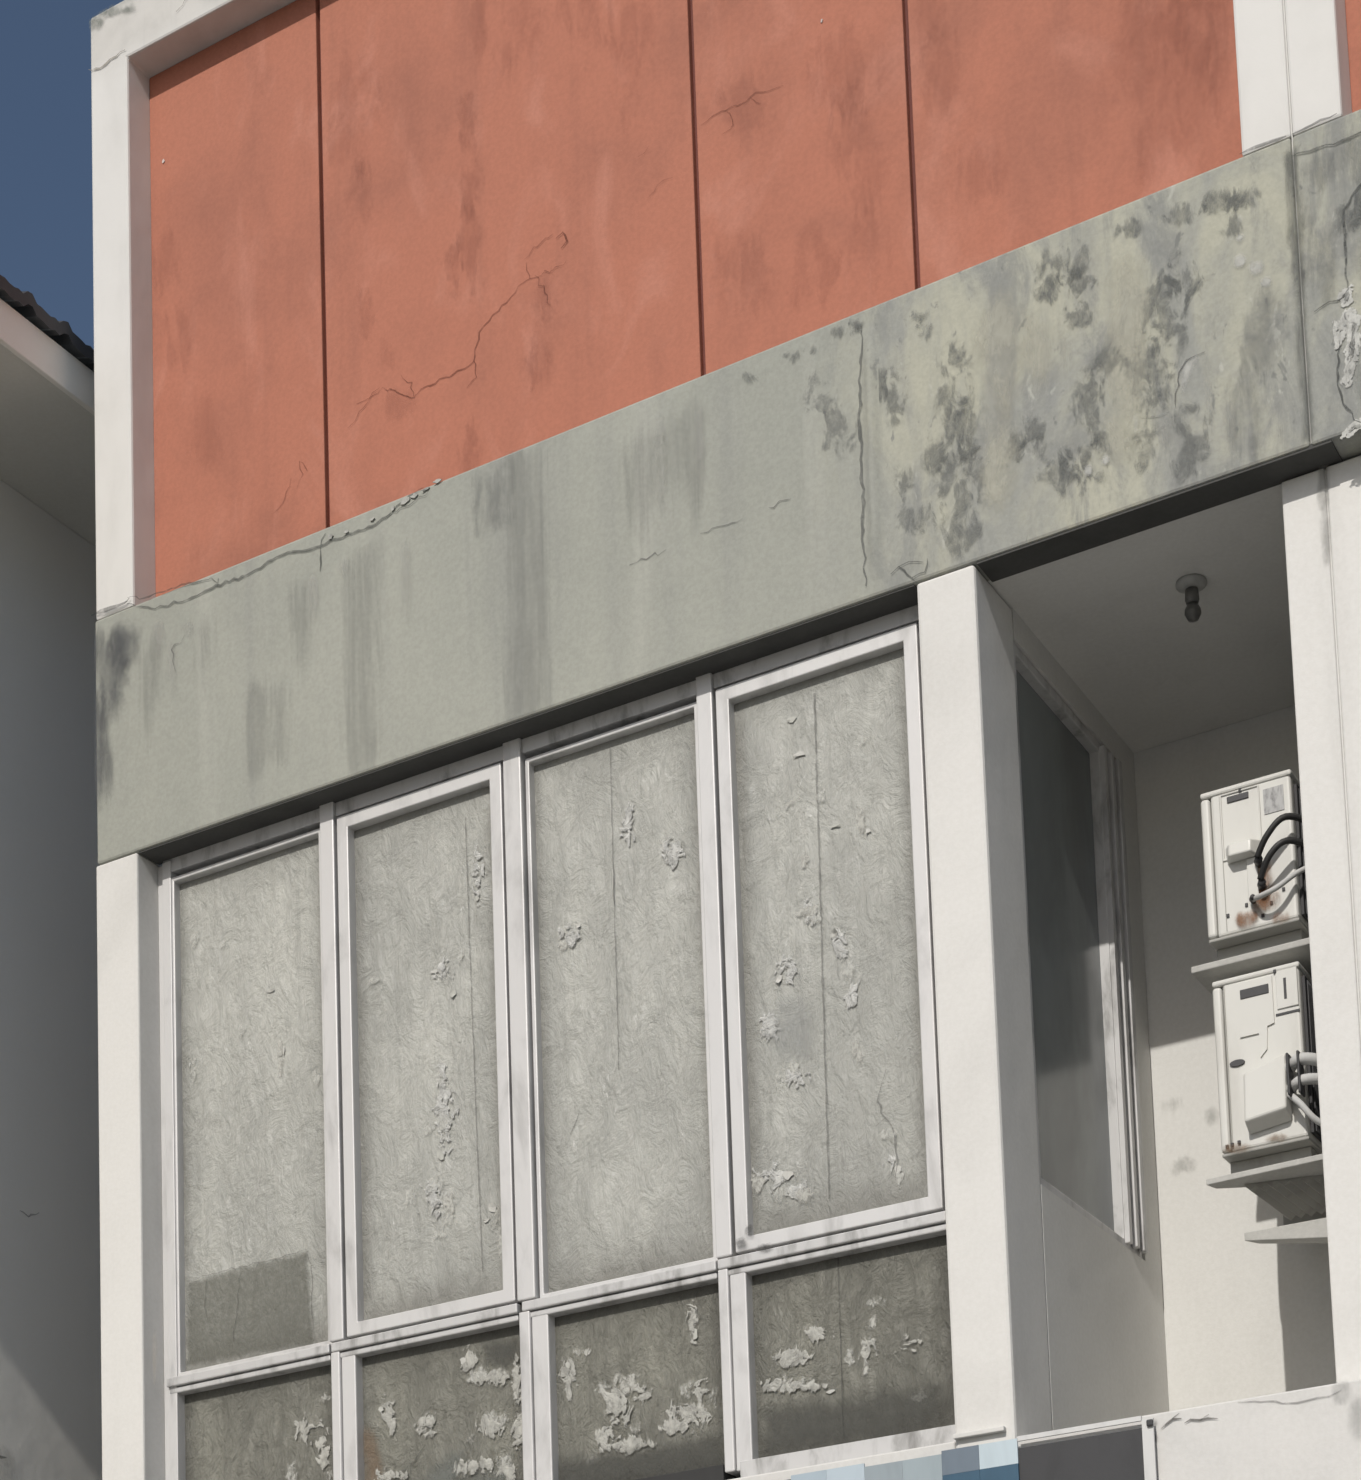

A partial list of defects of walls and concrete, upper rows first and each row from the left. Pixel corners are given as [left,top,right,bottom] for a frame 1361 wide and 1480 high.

crack [1240,113,1361,154]
crack [1314,183,1361,312]
crack [1336,342,1361,423]
crack [857,325,928,586]
spalling [1340,418,1361,439]
crack [91,487,425,616]
peeling [760,1326,835,1395]
peeling [844,1300,878,1374]
peeling [294,1416,333,1479]
peeling [377,1394,438,1438]
peeling [454,1344,523,1480]
peeling [587,1374,714,1463]